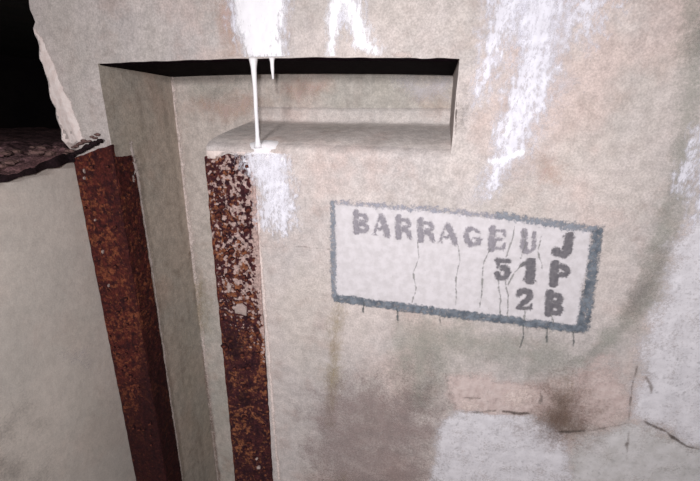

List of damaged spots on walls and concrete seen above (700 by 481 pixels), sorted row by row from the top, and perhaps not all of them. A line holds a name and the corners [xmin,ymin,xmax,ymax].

water stain [224,0,293,57]
efflorescence [324,0,382,56]
efflorescence [473,0,609,199]
rust [215,195,231,239]
efflorescence [239,140,298,237]